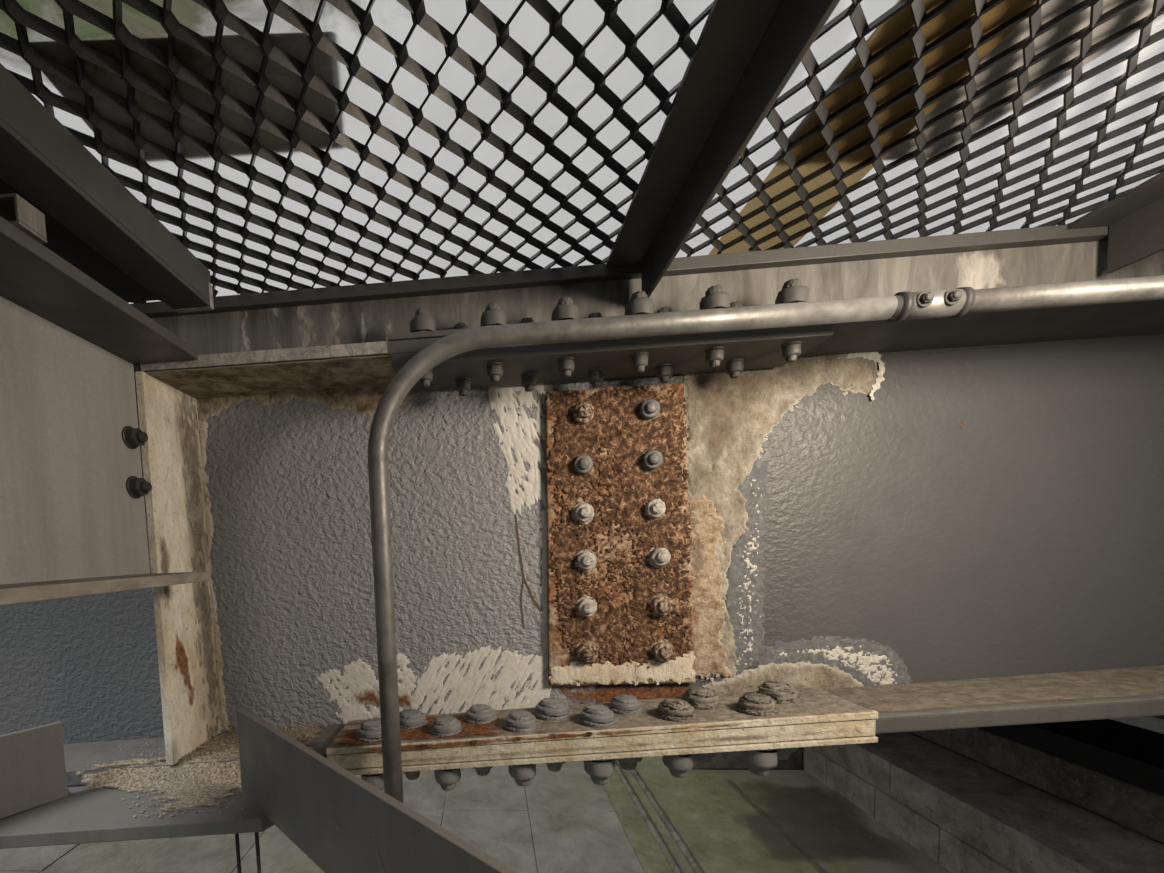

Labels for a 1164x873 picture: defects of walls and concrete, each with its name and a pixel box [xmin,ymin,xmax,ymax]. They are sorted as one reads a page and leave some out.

peeling [134,355,396,740]
crack [515,514,543,629]
rust [546,385,695,670]
spalling [397,352,913,715]
rust [176,637,195,705]
rust [359,692,380,704]
rust [561,687,687,703]
rust [328,722,382,754]
rust [400,715,738,750]